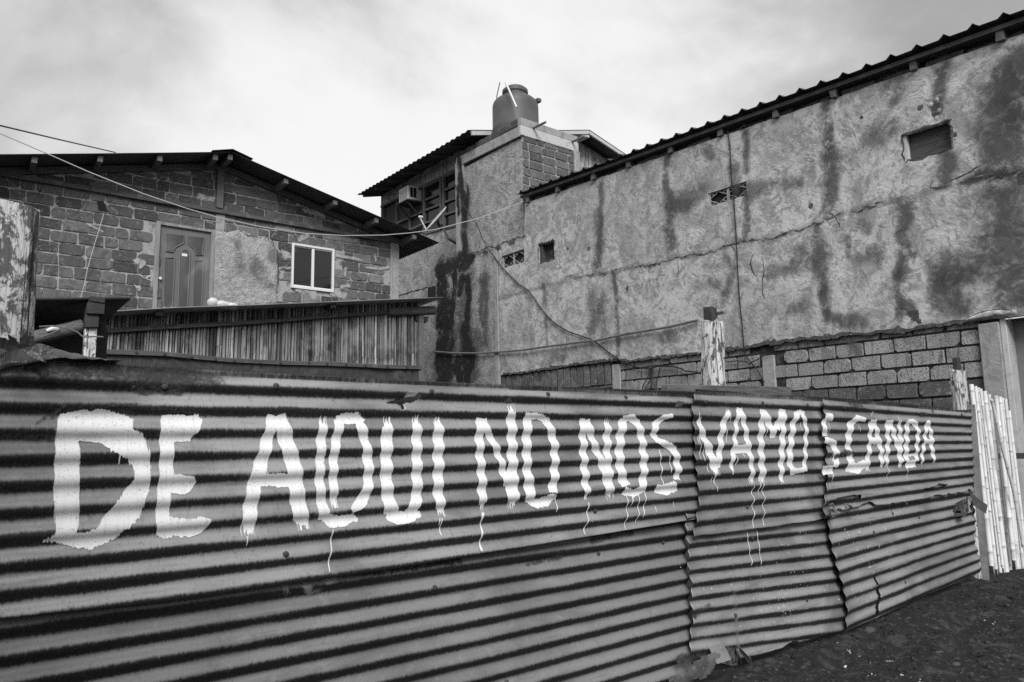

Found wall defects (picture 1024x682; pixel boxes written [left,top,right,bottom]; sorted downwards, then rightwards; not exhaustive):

leakage [433,154,488,383]
leakage [662,152,676,248]
crack [557,201,879,289]
leakage [823,99,839,214]
leakage [812,225,865,328]
leakage [893,203,917,319]
leakage [932,47,1024,315]